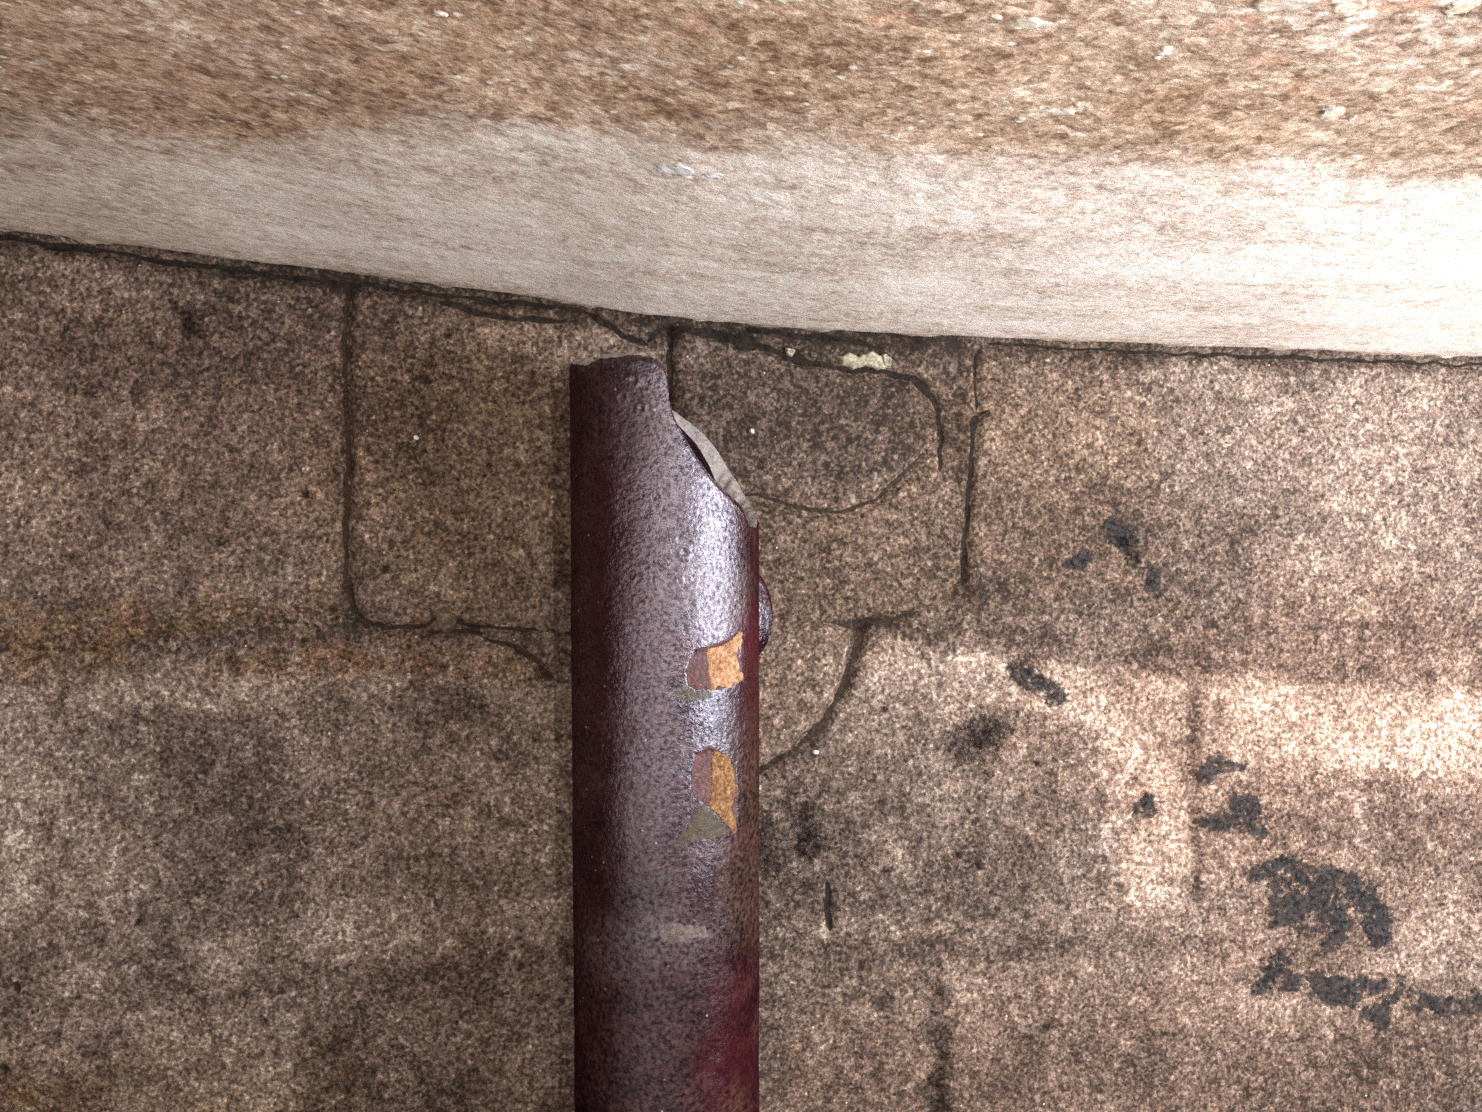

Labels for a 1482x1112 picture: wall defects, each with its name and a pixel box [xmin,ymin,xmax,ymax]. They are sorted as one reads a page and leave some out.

crack [0,234,1482,682]
damp [1101,518,1140,548]
damp [1062,549,1095,571]
damp [1145,566,1164,598]
crack [759,611,918,774]
damp [1007,659,1070,707]
damp [1197,751,1249,785]
damp [1133,793,1162,818]
damp [1193,792,1268,840]